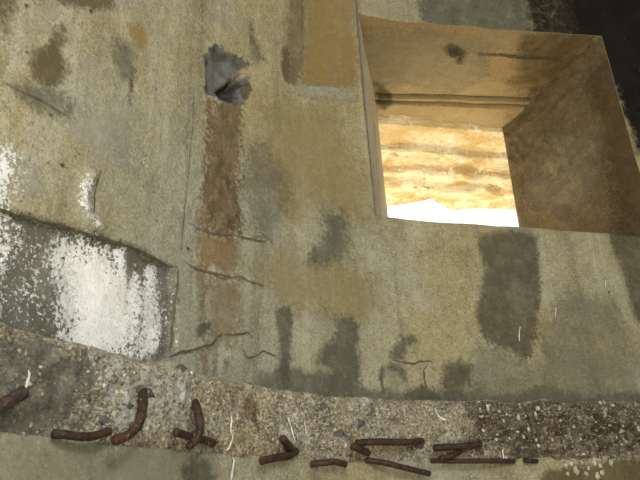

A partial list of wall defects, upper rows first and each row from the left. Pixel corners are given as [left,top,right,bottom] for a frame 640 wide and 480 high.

water stain [19,25,133,165]
spalling [203,43,254,106]
corrosion [198,94,245,272]
crack [186,262,264,286]
water stain [0,143,640,480]
crack [169,332,276,359]
crack [394,360,433,391]
spalling [51,388,148,446]
spalling [172,399,217,450]
corrosion [245,393,260,429]
spalling [259,435,299,465]
spalling [350,438,515,477]